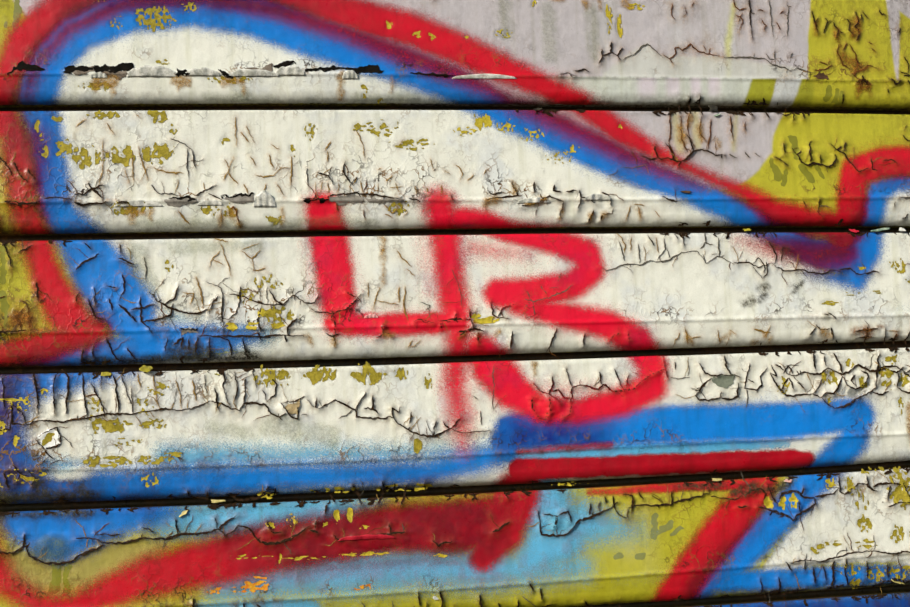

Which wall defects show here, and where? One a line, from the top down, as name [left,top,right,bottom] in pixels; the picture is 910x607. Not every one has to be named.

crack [560,0,910,103]
peeling [7,61,45,75]
peeling [64,59,384,99]
peeling [86,110,120,120]
peeling [147,110,177,135]
peeling [453,114,544,142]
peeling [34,120,174,169]
crack [0,480,426,565]
peeling [763,479,799,510]
peeling [825,466,910,549]
peeling [810,540,841,554]
peeling [841,563,910,589]